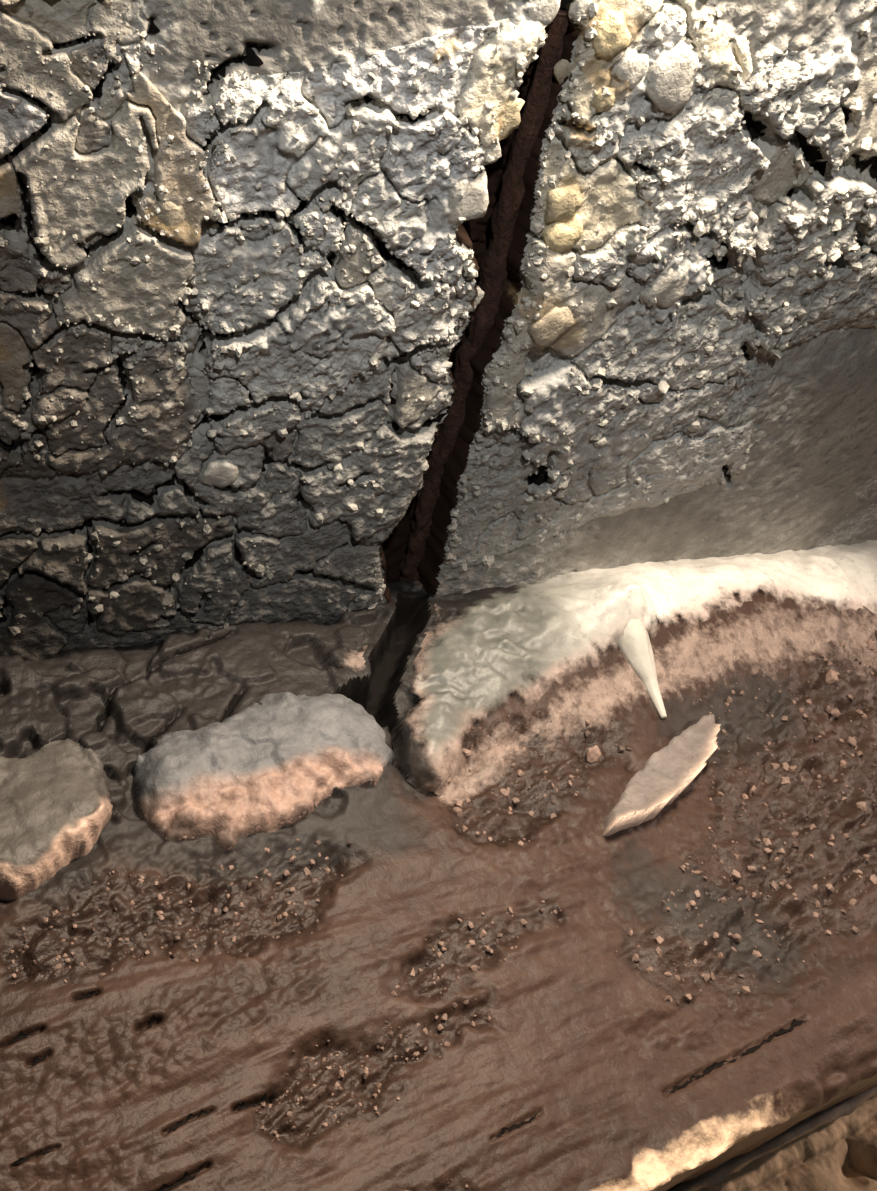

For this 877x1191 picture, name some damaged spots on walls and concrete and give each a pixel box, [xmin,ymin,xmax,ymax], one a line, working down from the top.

crack [205,43,268,94]
crack [0,86,52,260]
crack [84,188,184,256]
crack [215,194,419,284]
crack [741,112,877,181]
crack [178,297,294,352]
peeling [0,0,877,661]
crack [298,0,581,797]
crack [6,451,305,564]
damp [101,540,877,881]
spalling [615,630,877,1005]
damp [616,849,797,987]